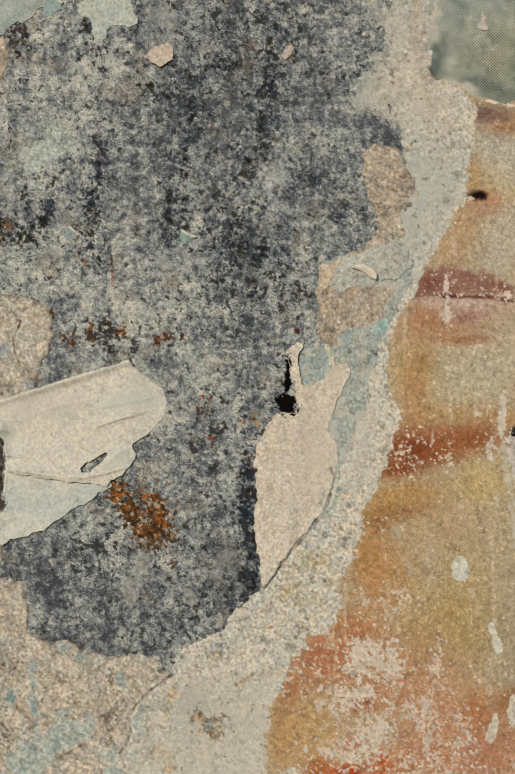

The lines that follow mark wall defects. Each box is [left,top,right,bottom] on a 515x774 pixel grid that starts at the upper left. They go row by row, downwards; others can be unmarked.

peeling [144,43,173,67]
peeling [281,44,293,60]
peeling [375,258,515,559]
corrosion [97,467,186,570]